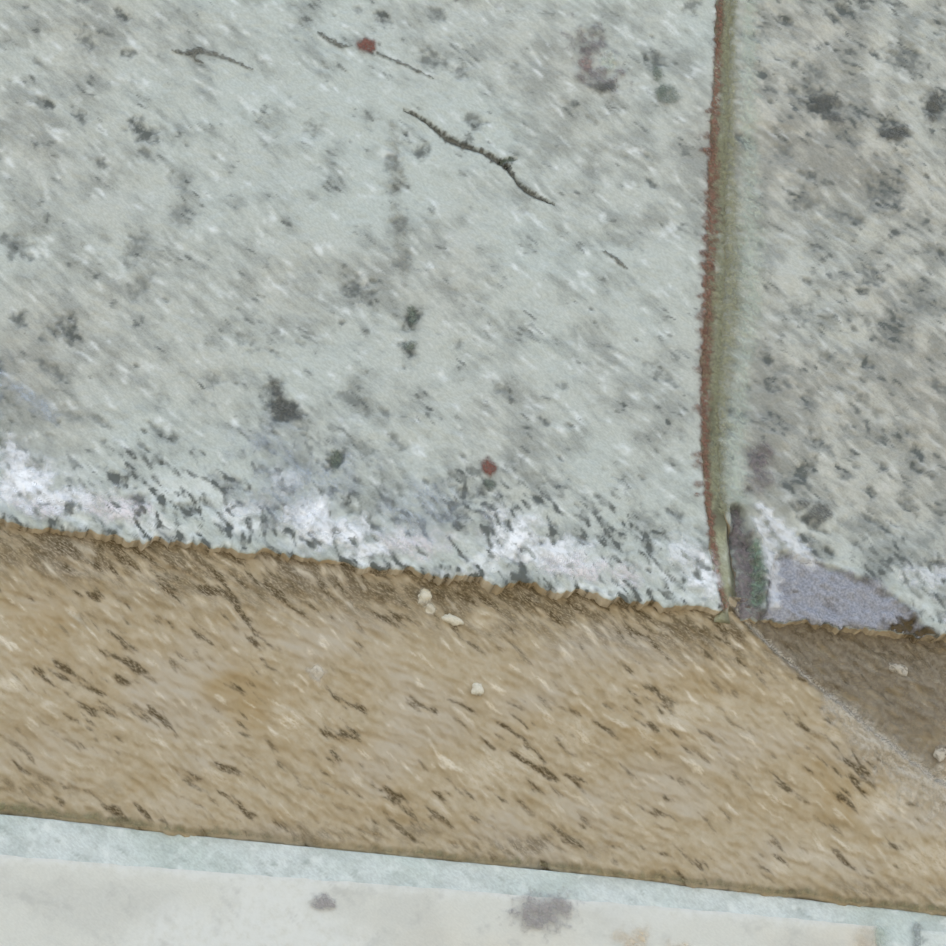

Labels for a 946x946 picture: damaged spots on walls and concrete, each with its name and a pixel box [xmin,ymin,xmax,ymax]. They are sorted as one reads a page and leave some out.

crack [404,111,553,205]
corrosion [695,0,729,609]